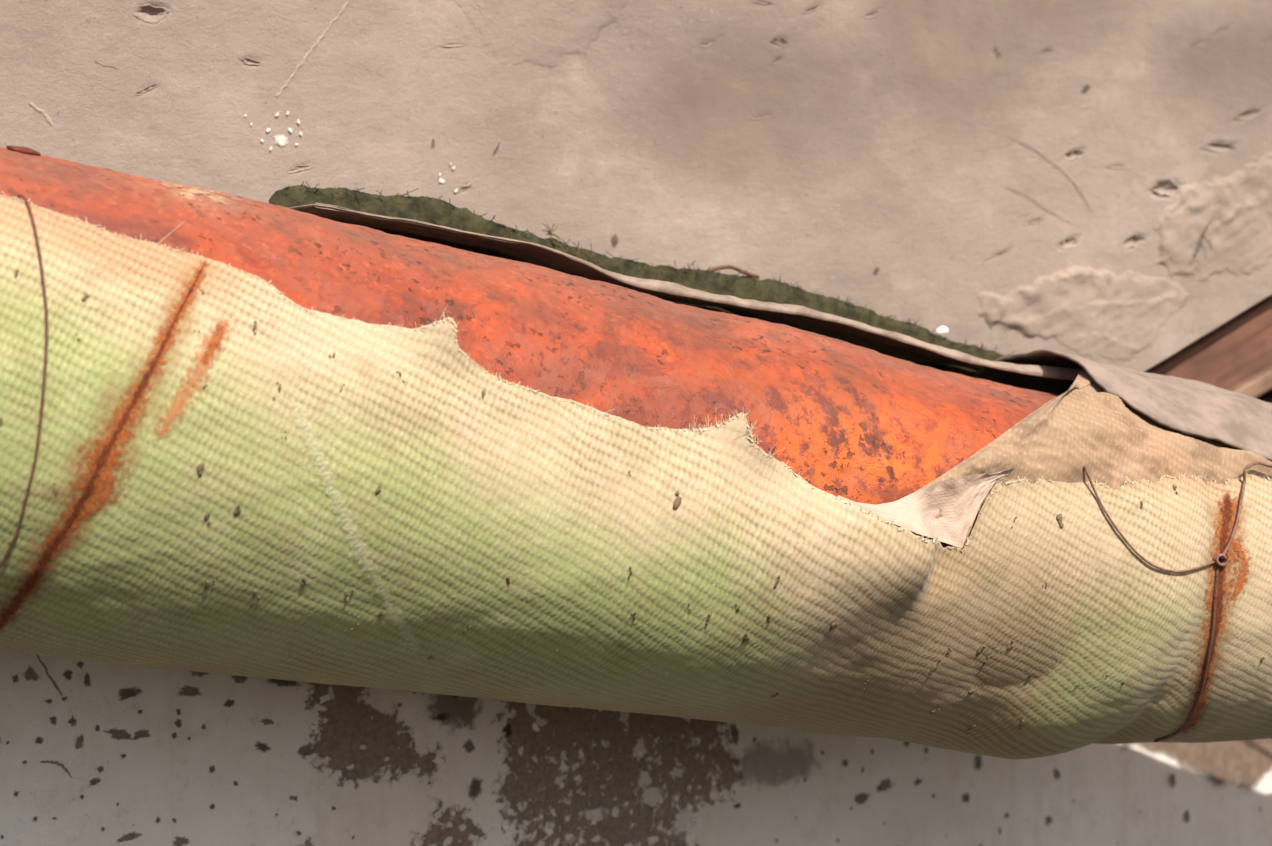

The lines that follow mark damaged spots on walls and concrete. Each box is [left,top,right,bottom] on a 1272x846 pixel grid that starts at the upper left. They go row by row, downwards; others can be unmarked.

corrosion [6,146,41,156]
corrosion [156,320,228,436]
corrosion [0,261,209,632]
corrosion [1180,493,1251,733]
peeling [294,682,446,789]
peeling [411,800,485,846]
peeling [493,700,744,846]